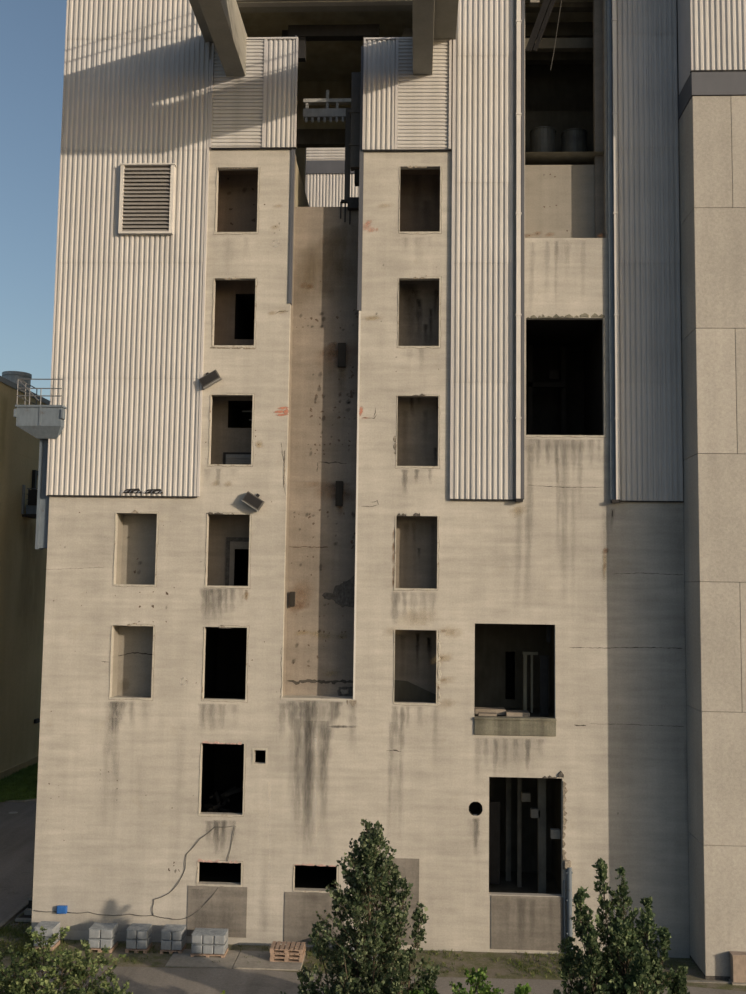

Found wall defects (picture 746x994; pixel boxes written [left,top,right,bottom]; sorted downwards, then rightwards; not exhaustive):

spalling [322,574,355,607]
spalling [338,687,357,706]